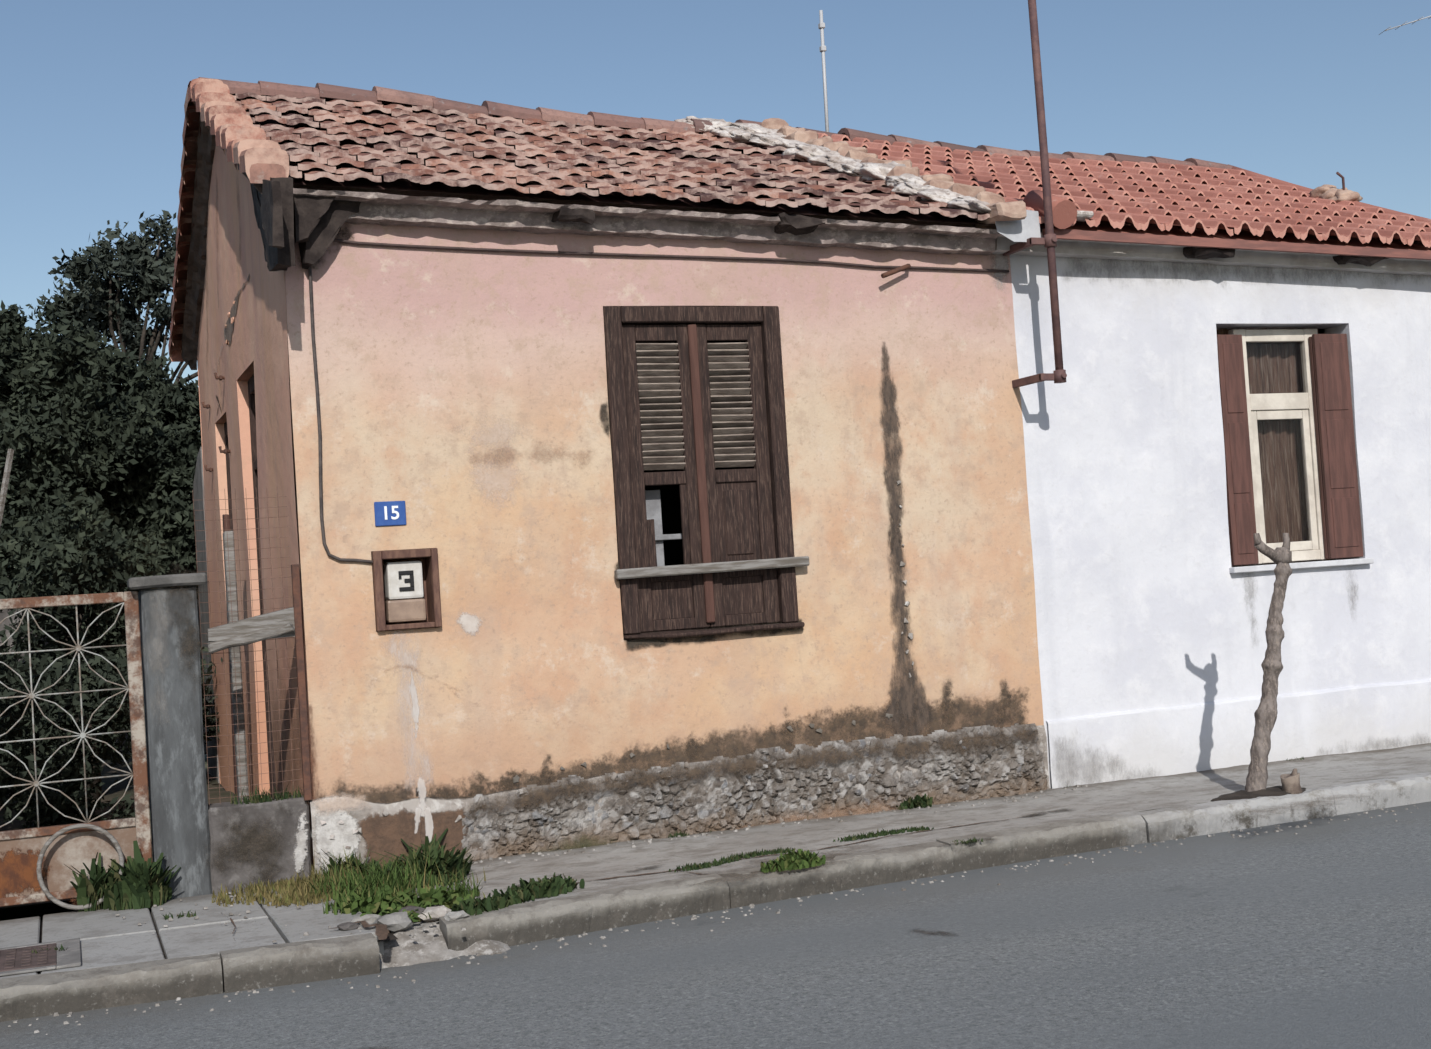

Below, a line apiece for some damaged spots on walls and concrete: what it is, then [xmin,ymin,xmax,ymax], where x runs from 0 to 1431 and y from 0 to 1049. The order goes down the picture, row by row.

spalling [224,276,249,345]
damp [320,344,1039,842]
corrosion [0,849,50,898]
spalling [312,723,1048,876]